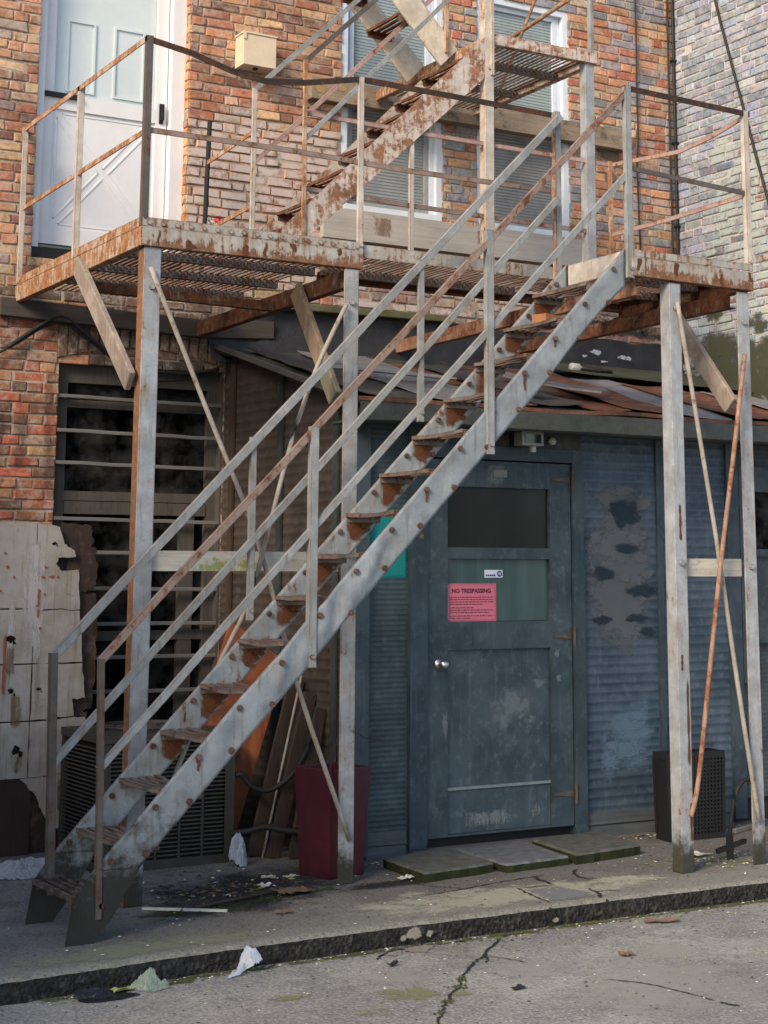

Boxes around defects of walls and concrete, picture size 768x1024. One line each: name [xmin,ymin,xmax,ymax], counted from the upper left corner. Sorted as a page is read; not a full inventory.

rust [379,219,391,237]
rust [413,445,436,463]
rust [380,477,405,506]
rust [347,513,373,541]
rust [317,563,340,587]
peeling [584,486,658,653]
rust [277,605,303,626]
crack [430,931,524,1024]
crack [611,979,740,1006]